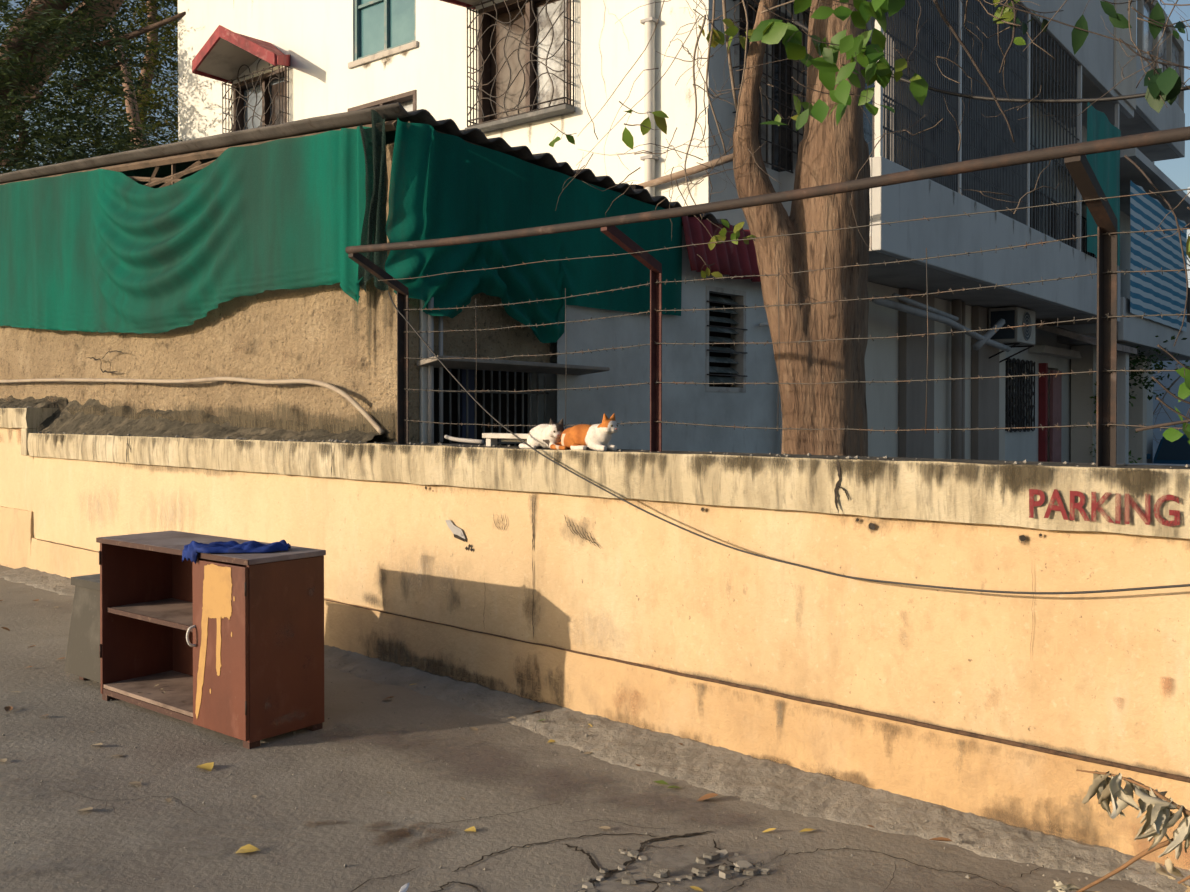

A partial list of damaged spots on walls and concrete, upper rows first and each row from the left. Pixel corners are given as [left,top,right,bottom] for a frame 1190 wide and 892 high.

water stain [318,443,408,460]
water stain [534,451,599,465]
crack [834,459,849,513]
water stain [797,459,1013,496]
water stain [366,570,385,603]
water stain [368,640,505,691]
crack [351,801,1044,892]